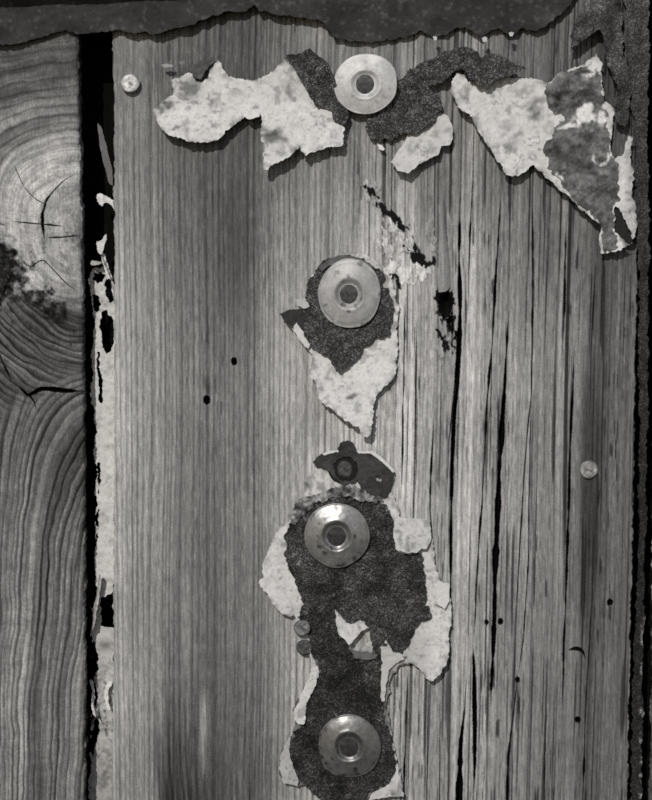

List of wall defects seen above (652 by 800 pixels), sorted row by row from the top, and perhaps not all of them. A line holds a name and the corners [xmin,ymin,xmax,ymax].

crack [0,166,79,290]
peeling [362,179,437,289]
crack [0,355,80,408]
crack [401,180,473,598]
crack [426,200,509,800]
crack [506,206,534,800]
crack [401,678,409,800]